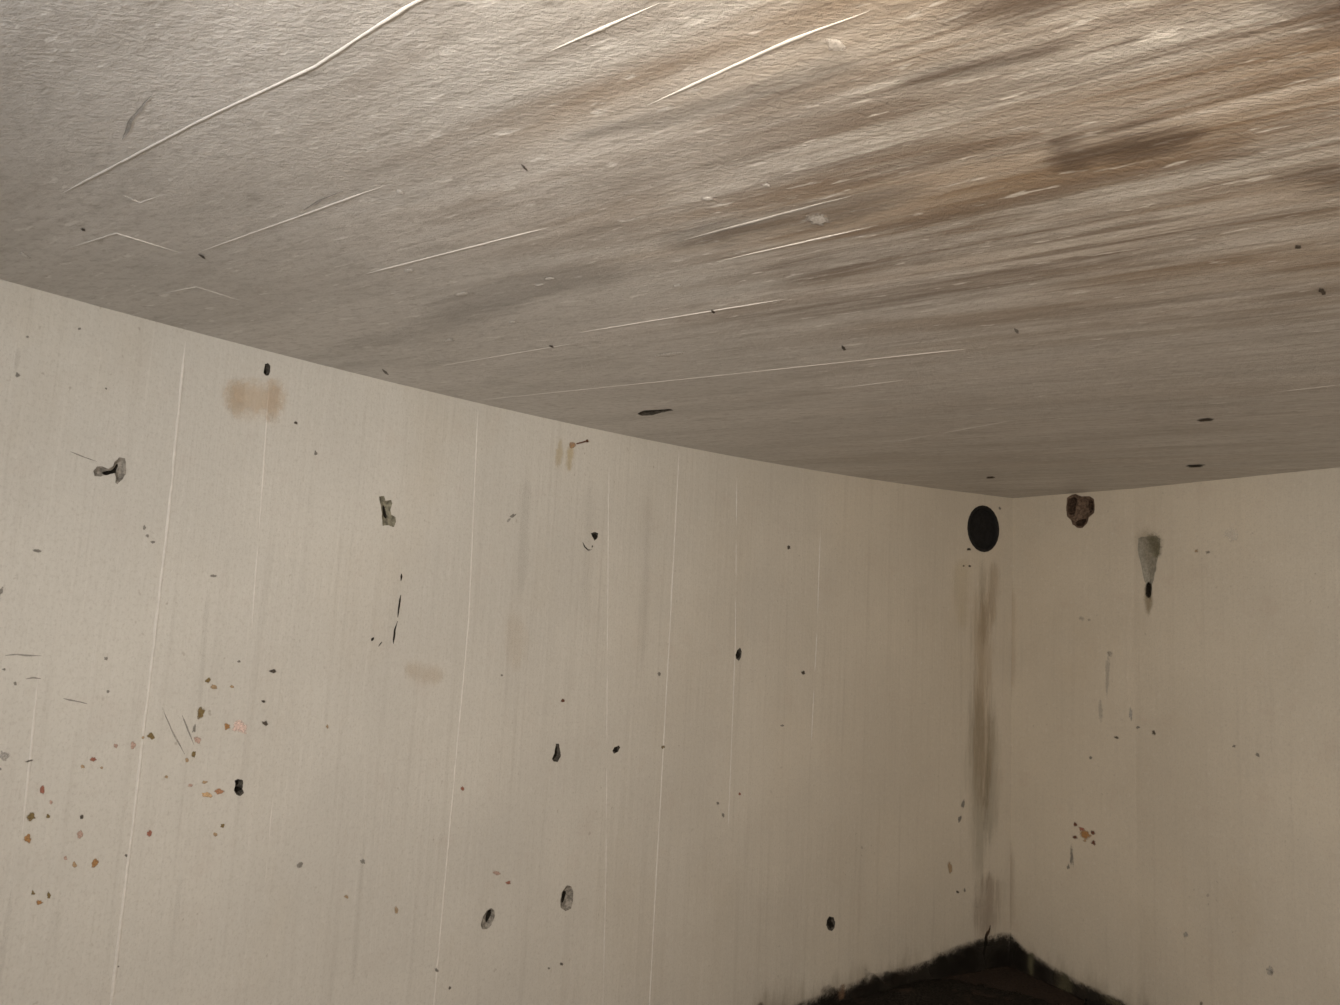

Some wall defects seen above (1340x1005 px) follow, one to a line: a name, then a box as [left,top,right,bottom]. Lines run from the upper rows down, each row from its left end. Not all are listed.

spalling [93,457,126,484]
spalling [1066,494,1095,528]